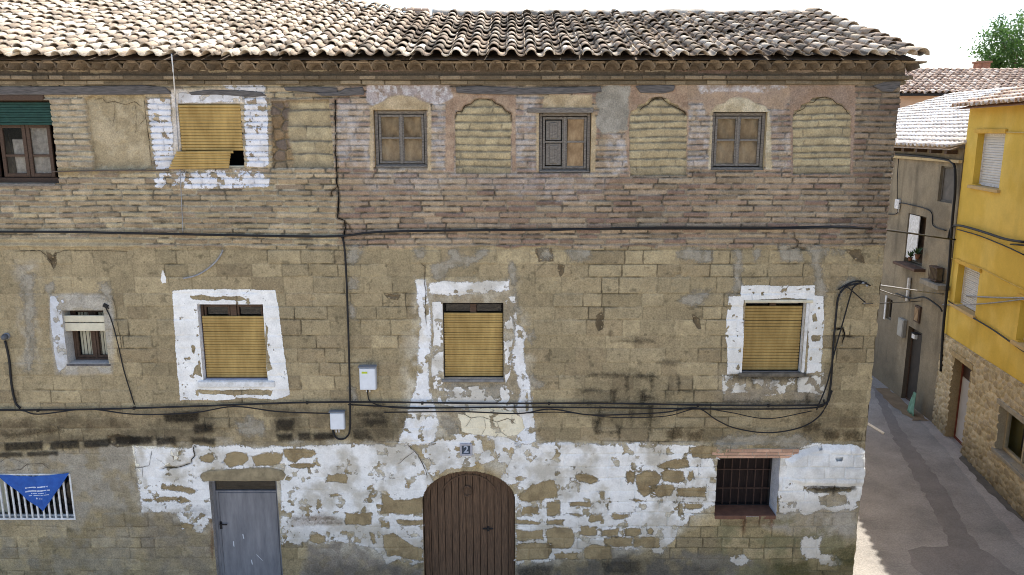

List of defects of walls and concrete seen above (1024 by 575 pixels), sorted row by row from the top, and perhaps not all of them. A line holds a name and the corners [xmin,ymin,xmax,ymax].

peeling [147,85,270,189]
peeling [50,296,68,372]
peeling [722,285,825,396]
leakage [0,431,175,457]
leakage [164,412,214,445]
leakage [276,420,334,441]
peeling [107,270,720,565]
peeling [778,443,862,516]
peeling [730,554,751,566]
peeling [800,536,843,566]